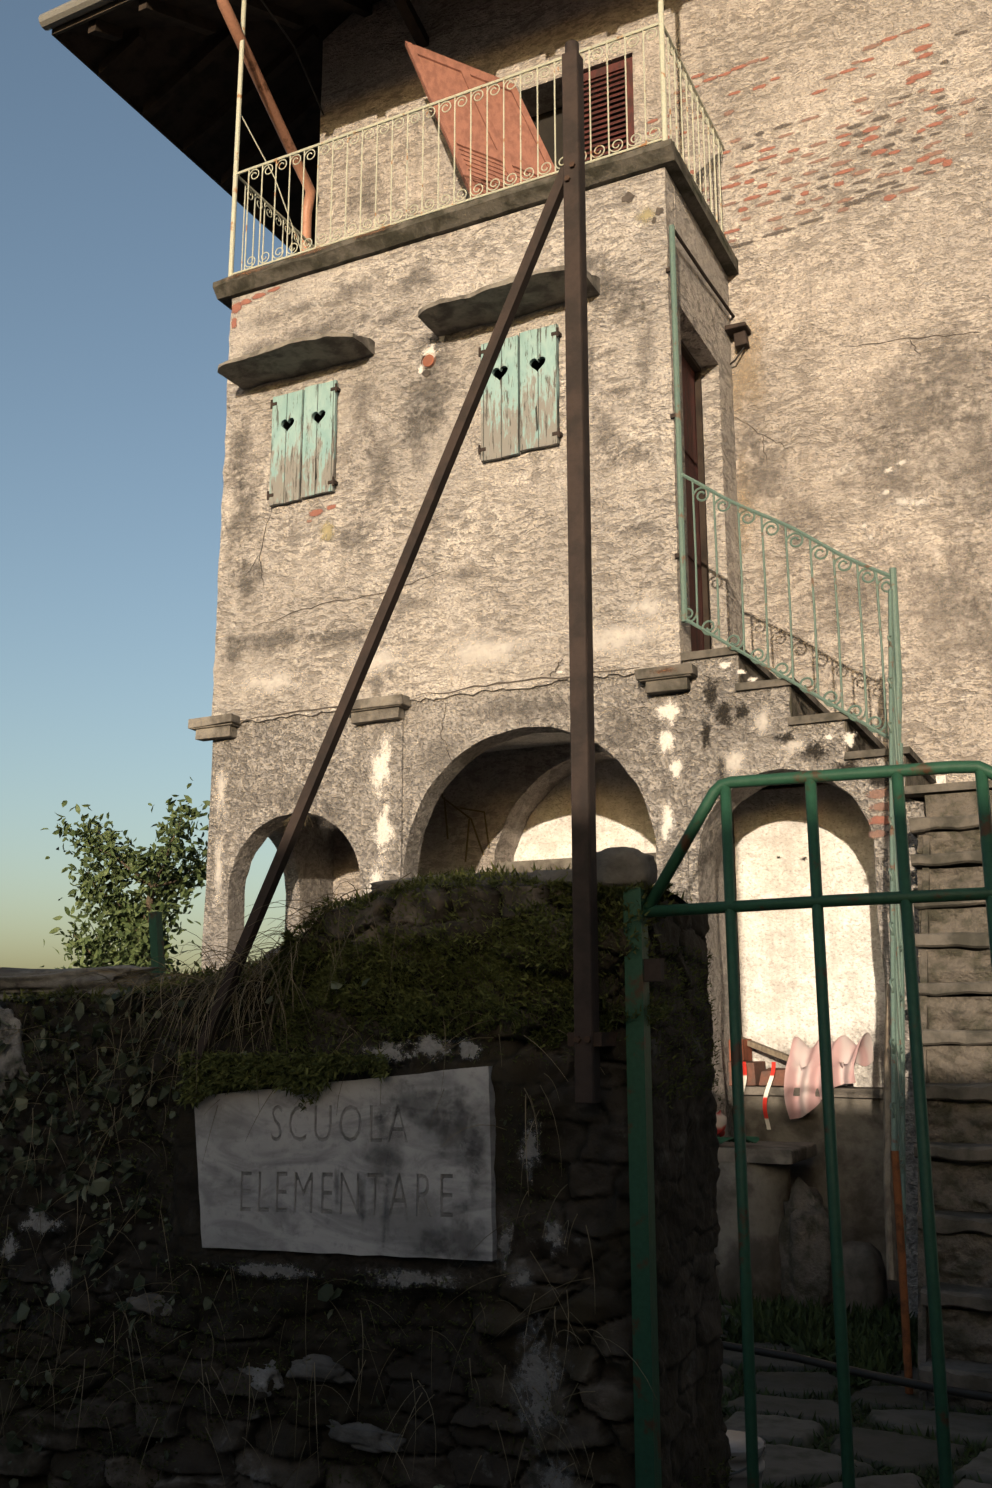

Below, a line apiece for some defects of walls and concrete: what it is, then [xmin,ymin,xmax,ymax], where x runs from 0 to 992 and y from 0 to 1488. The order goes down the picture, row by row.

spalling [418,335,445,377]
crack [240,706,338,721]
crack [415,659,640,762]
peeling [656,696,683,779]
damp [701,676,749,748]
peeling [366,734,396,893]
peeling [660,800,676,844]